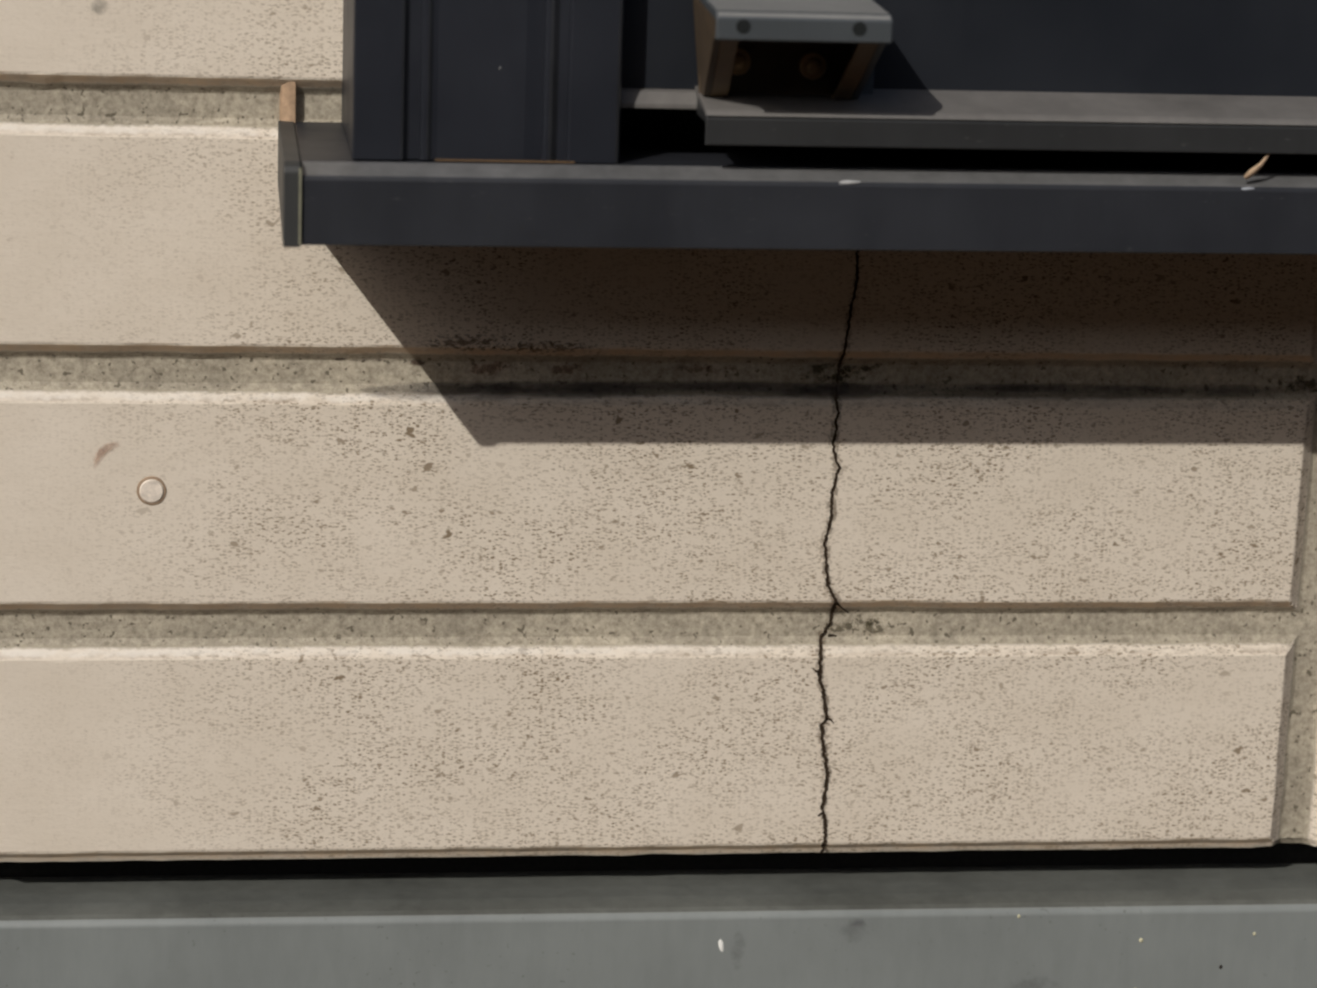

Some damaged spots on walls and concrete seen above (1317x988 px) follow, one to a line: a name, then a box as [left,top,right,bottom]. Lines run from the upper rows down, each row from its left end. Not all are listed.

crack [812,250,859,854]